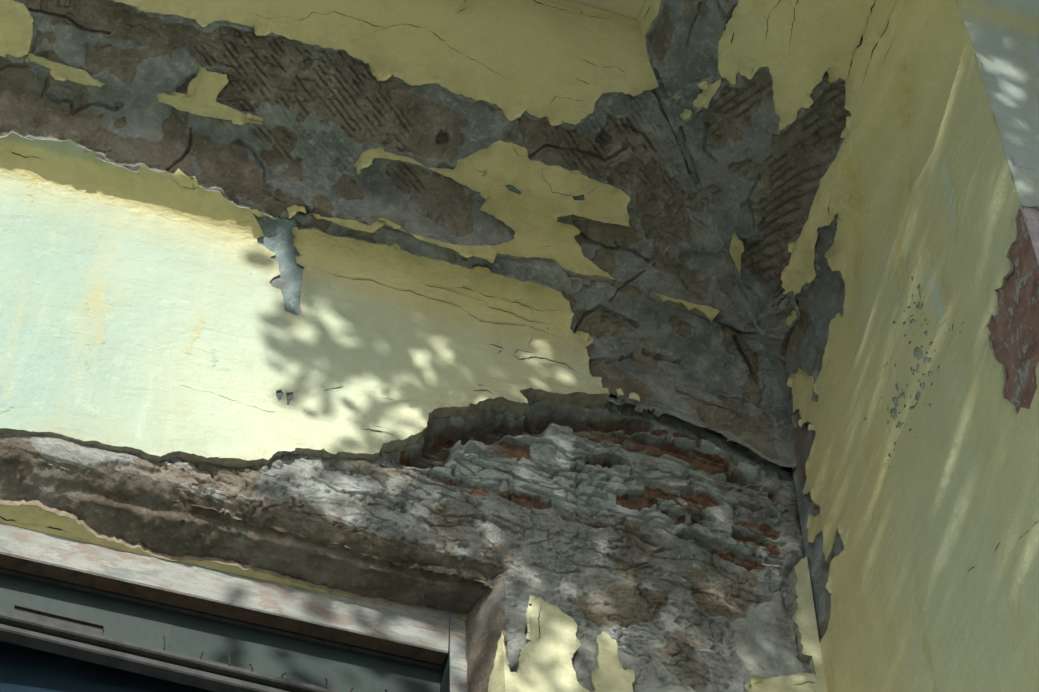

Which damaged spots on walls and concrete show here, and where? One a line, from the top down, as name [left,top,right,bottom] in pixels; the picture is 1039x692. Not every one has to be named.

crack [0,45,8,58]
crack [839,0,876,79]
crack [321,380,344,390]
crack [361,423,404,438]
flaking render [0,0,853,642]
crack [304,233,585,374]
peeling [888,278,940,431]
peeling [988,207,1039,414]
flaking render [0,399,813,692]